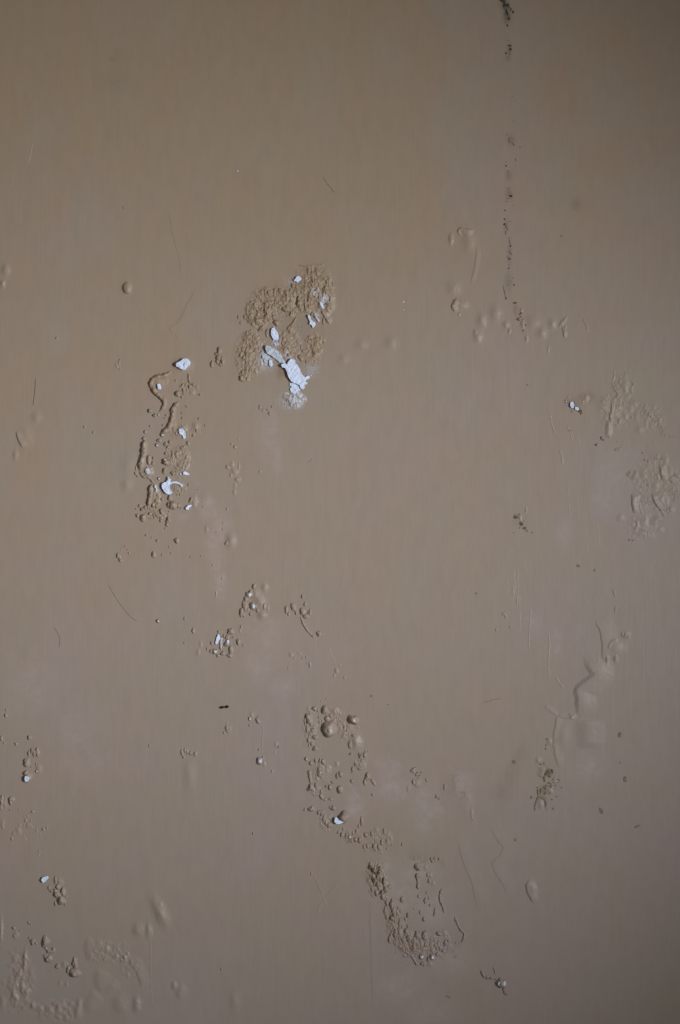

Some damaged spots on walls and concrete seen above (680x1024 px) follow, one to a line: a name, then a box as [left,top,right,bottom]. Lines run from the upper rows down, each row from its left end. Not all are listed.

peeling [232,262,341,415]